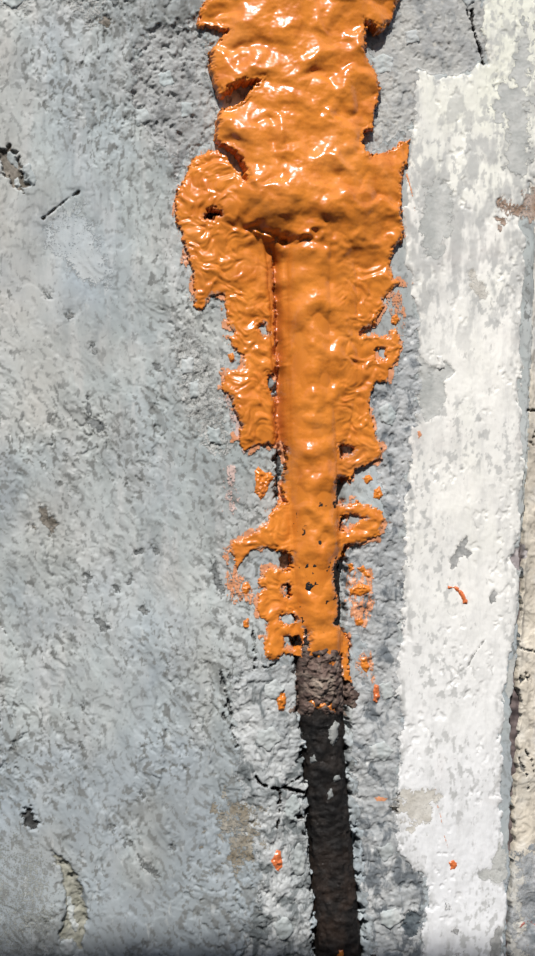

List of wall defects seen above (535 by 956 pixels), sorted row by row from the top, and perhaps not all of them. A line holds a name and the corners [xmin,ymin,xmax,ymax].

crack [466,9,485,65]
peeling [487,15,535,178]
hole [0,143,37,194]
peeling [417,177,454,260]
spalling [449,536,472,569]
crack [251,631,276,669]
rust [289,644,360,716]
crack [219,671,238,748]
crack [508,647,535,851]
hole [21,805,39,829]
crack [255,775,306,829]
peeling [478,842,508,883]